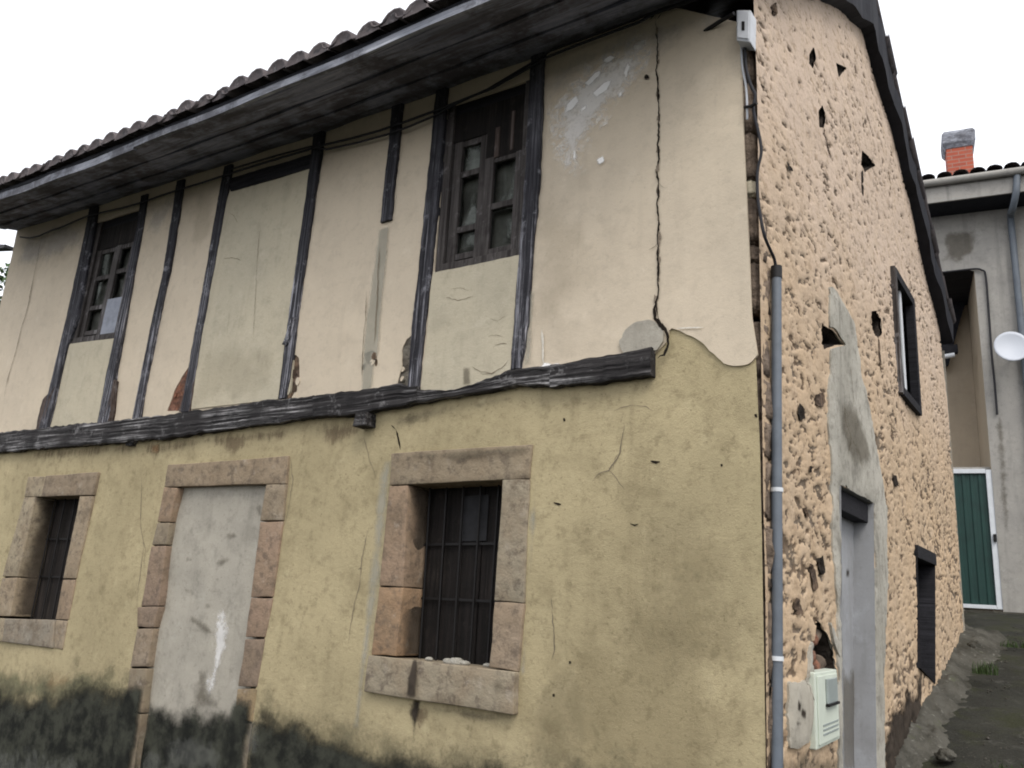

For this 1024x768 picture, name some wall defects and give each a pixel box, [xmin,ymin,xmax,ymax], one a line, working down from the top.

crack [649,14,669,358]
spalling [821,324,841,349]
spalling [168,370,188,411]
spalling [287,355,300,399]
crack [594,405,652,487]
spalling [805,620,842,700]